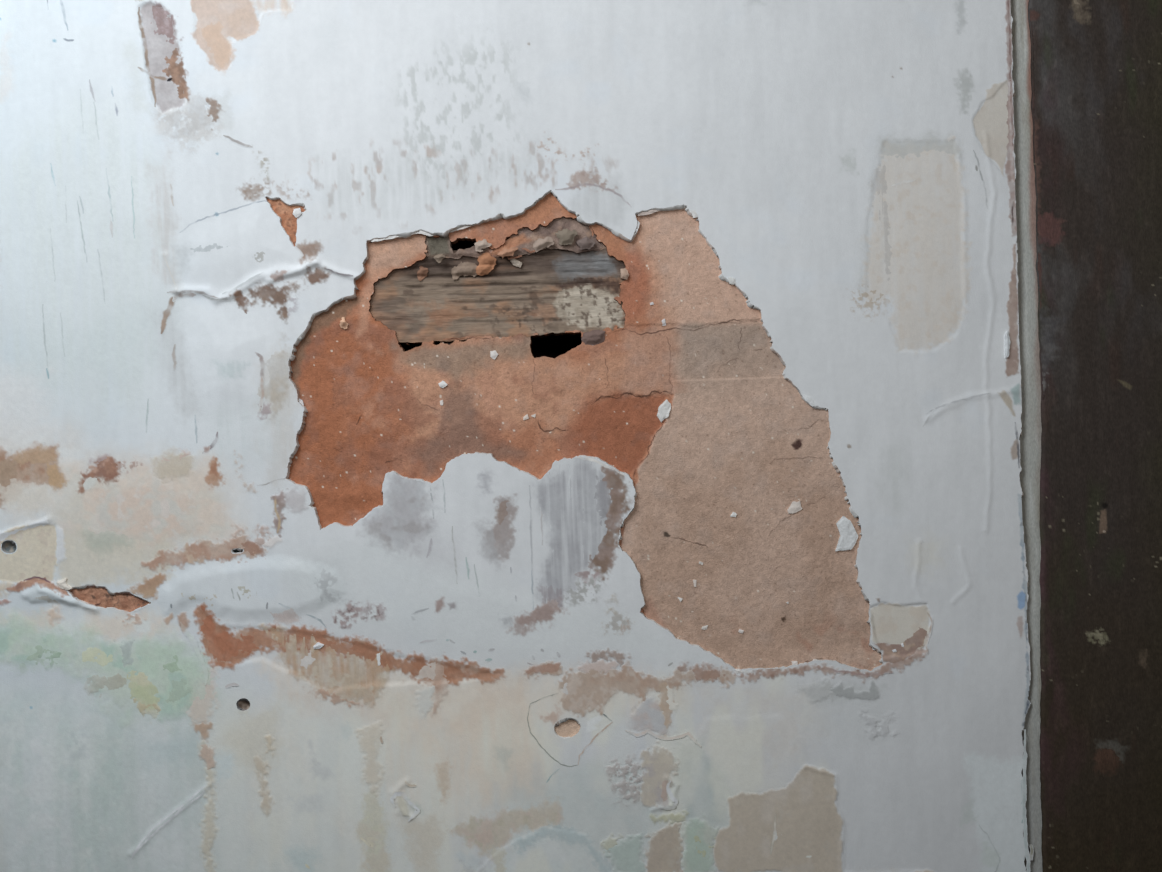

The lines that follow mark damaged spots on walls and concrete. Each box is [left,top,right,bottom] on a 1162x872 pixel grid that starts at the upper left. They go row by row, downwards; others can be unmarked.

peeling [188,0,302,78]
spalling [0,193,933,747]
damp [351,716,613,872]